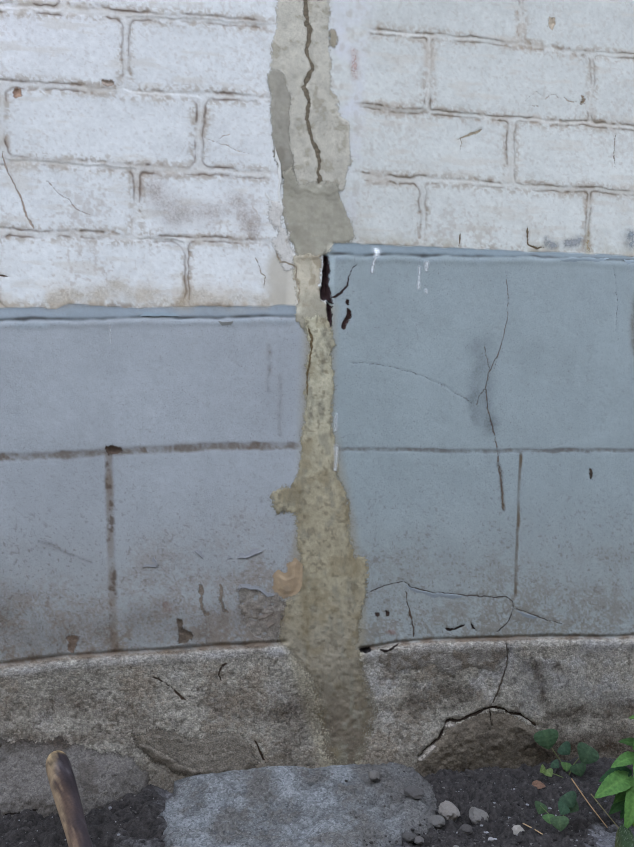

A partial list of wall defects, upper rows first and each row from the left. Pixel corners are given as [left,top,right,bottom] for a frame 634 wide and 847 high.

crack [301,0,322,184]
crack [2,151,34,229]
peeling [252,149,296,271]
crack [331,265,356,298]
spalling [341,300,352,330]
crack [353,279,509,509]
crack [153,677,186,700]
crack [370,581,562,756]